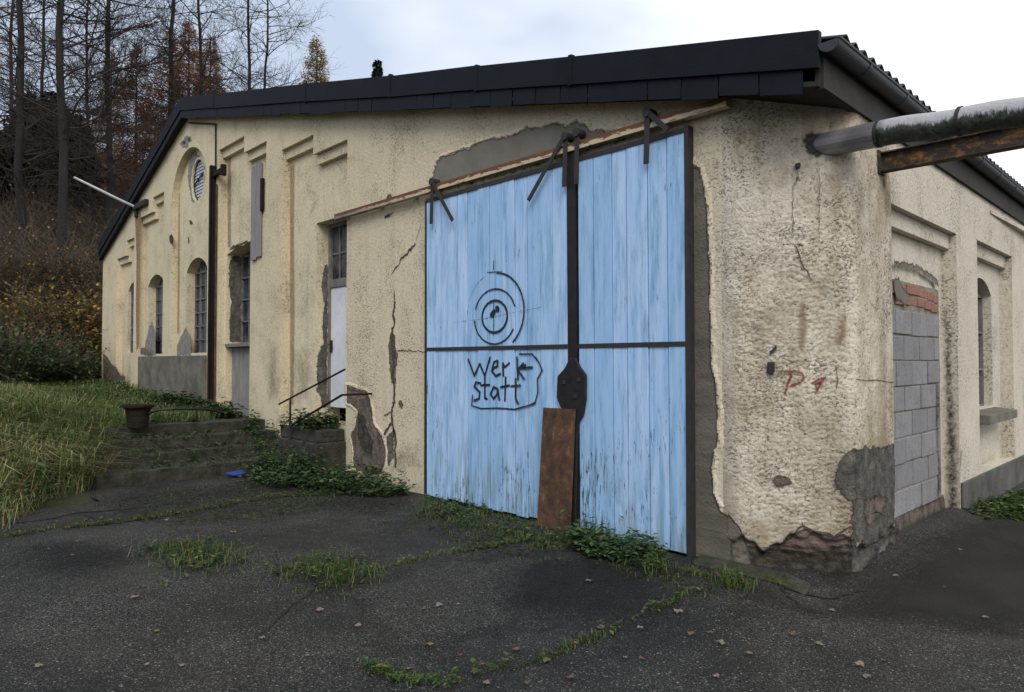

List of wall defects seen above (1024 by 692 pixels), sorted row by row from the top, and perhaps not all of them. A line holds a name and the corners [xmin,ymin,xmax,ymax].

flaking render [429,115,629,194]
crack [3,220,423,539]
flaking render [228,240,248,342]
flaking render [316,265,328,408]
flaking render [344,381,394,479]
flaking render [388,333,398,384]
flaking render [693,156,853,575]
flaking render [894,260,939,287]